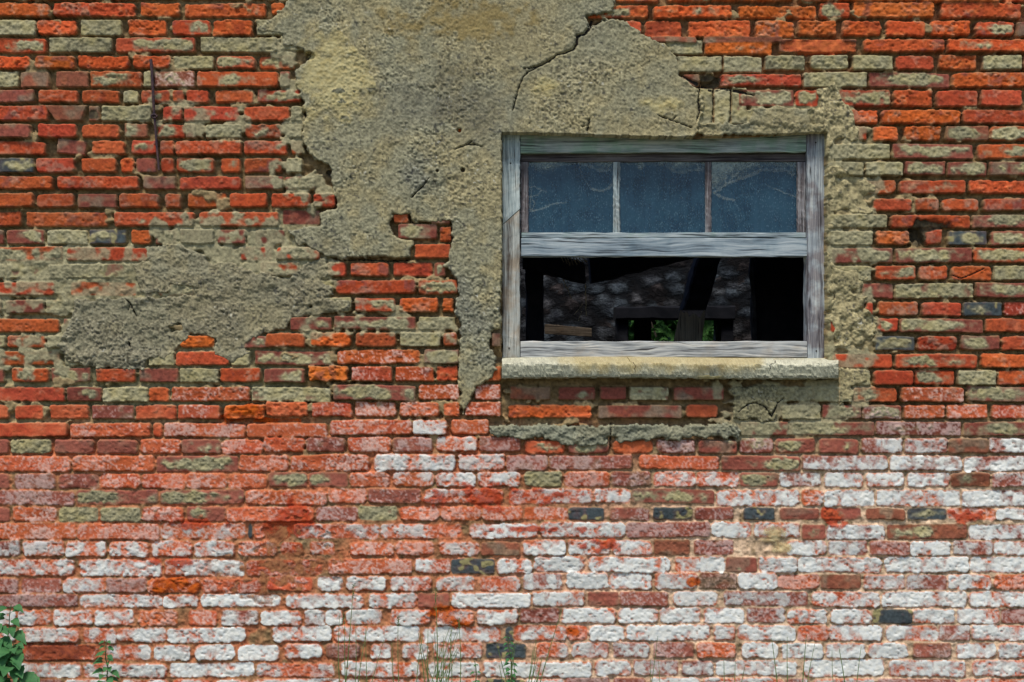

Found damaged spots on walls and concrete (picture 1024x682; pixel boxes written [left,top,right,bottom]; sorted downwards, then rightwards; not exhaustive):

crack [512,21,601,110]
crack [659,76,753,128]
flaking render [57,0,859,414]
spalling [908,219,950,247]
flaking render [824,166,877,347]
flaking render [489,384,778,447]
crack [739,399,783,416]
leakage [261,493,320,539]
leakage [462,482,565,512]
leakage [489,525,557,533]
leakage [576,527,621,554]
leakage [820,507,848,529]